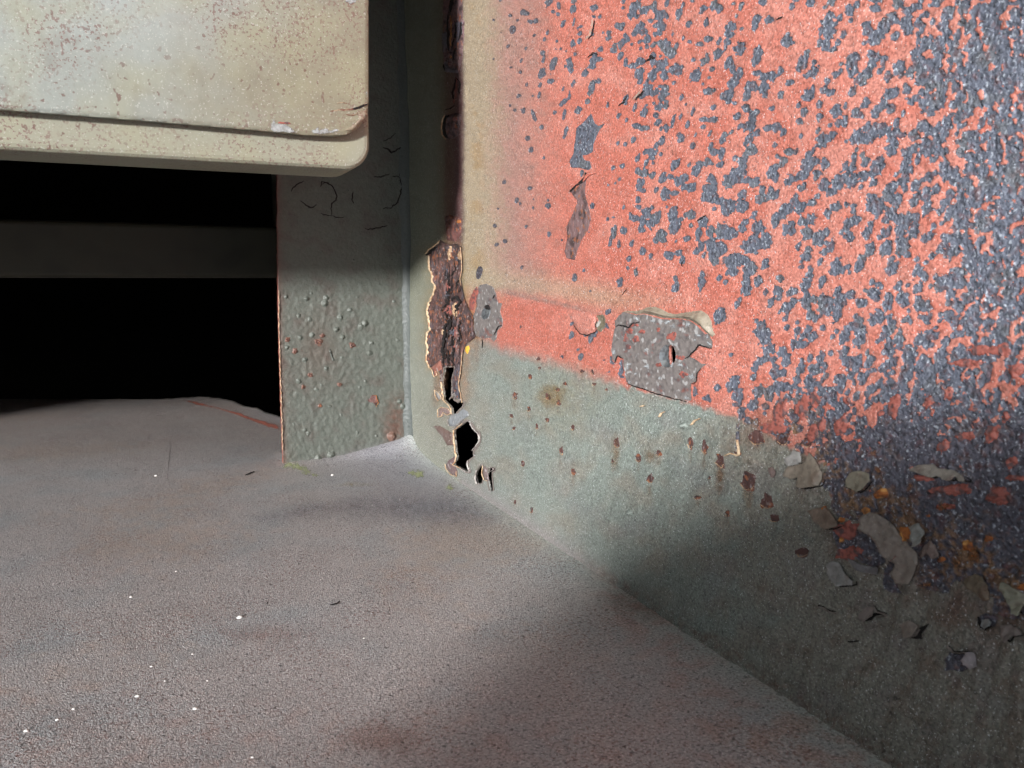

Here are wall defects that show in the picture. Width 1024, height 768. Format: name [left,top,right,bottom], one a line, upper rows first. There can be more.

crack [291,133,402,230]
spalling [492,0,933,402]
peeling [920,217,937,244]
corrosion [425,215,476,403]
peeling [998,369,1016,386]
peeling [433,390,469,477]
peeling [768,440,825,490]
peeling [845,471,873,493]
peeling [832,512,939,594]